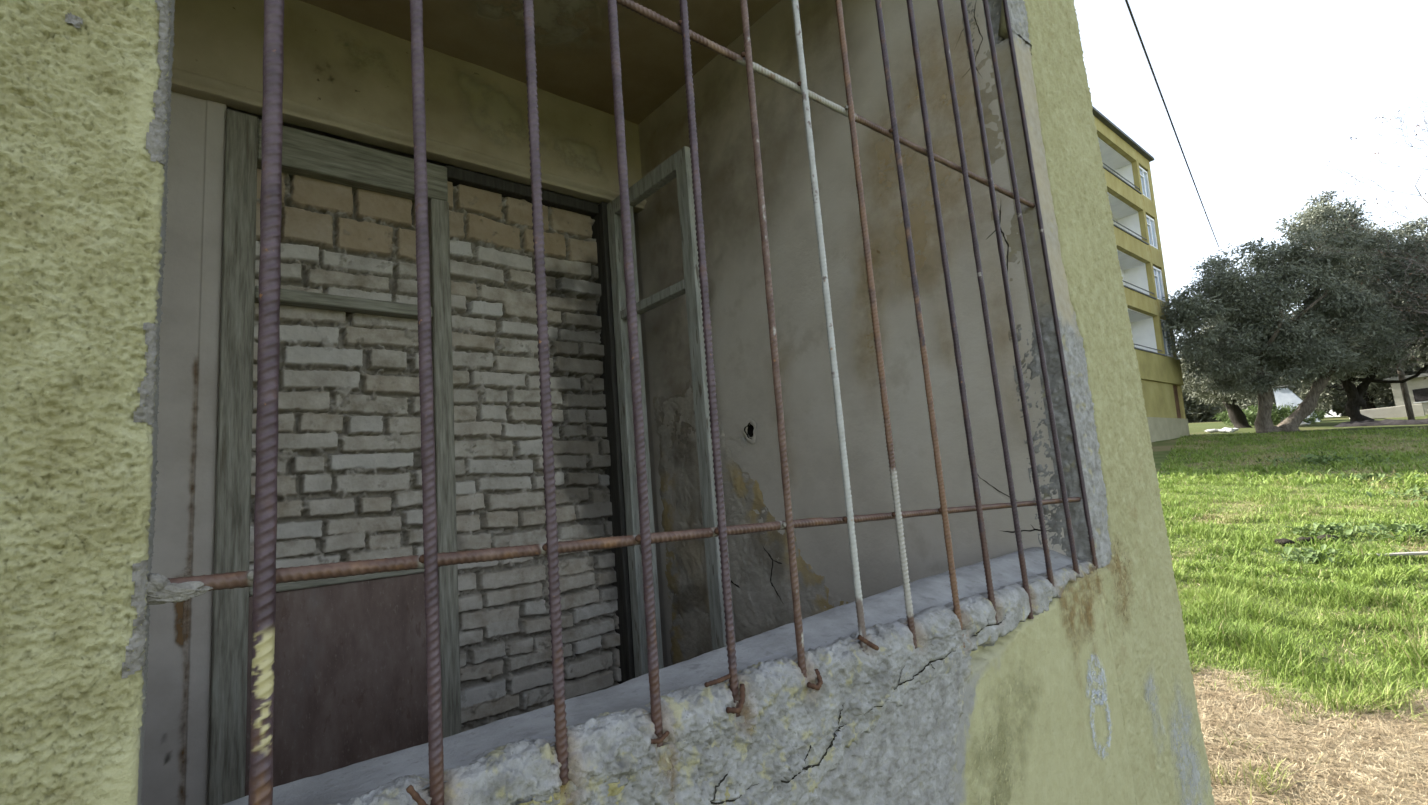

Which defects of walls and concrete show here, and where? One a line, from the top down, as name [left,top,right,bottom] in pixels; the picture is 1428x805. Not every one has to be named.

spalling [146,0,173,176]
spalling [133,322,158,427]
spalling [327,0,1112,805]
rust [175,599,190,647]
crack [710,615,1006,805]